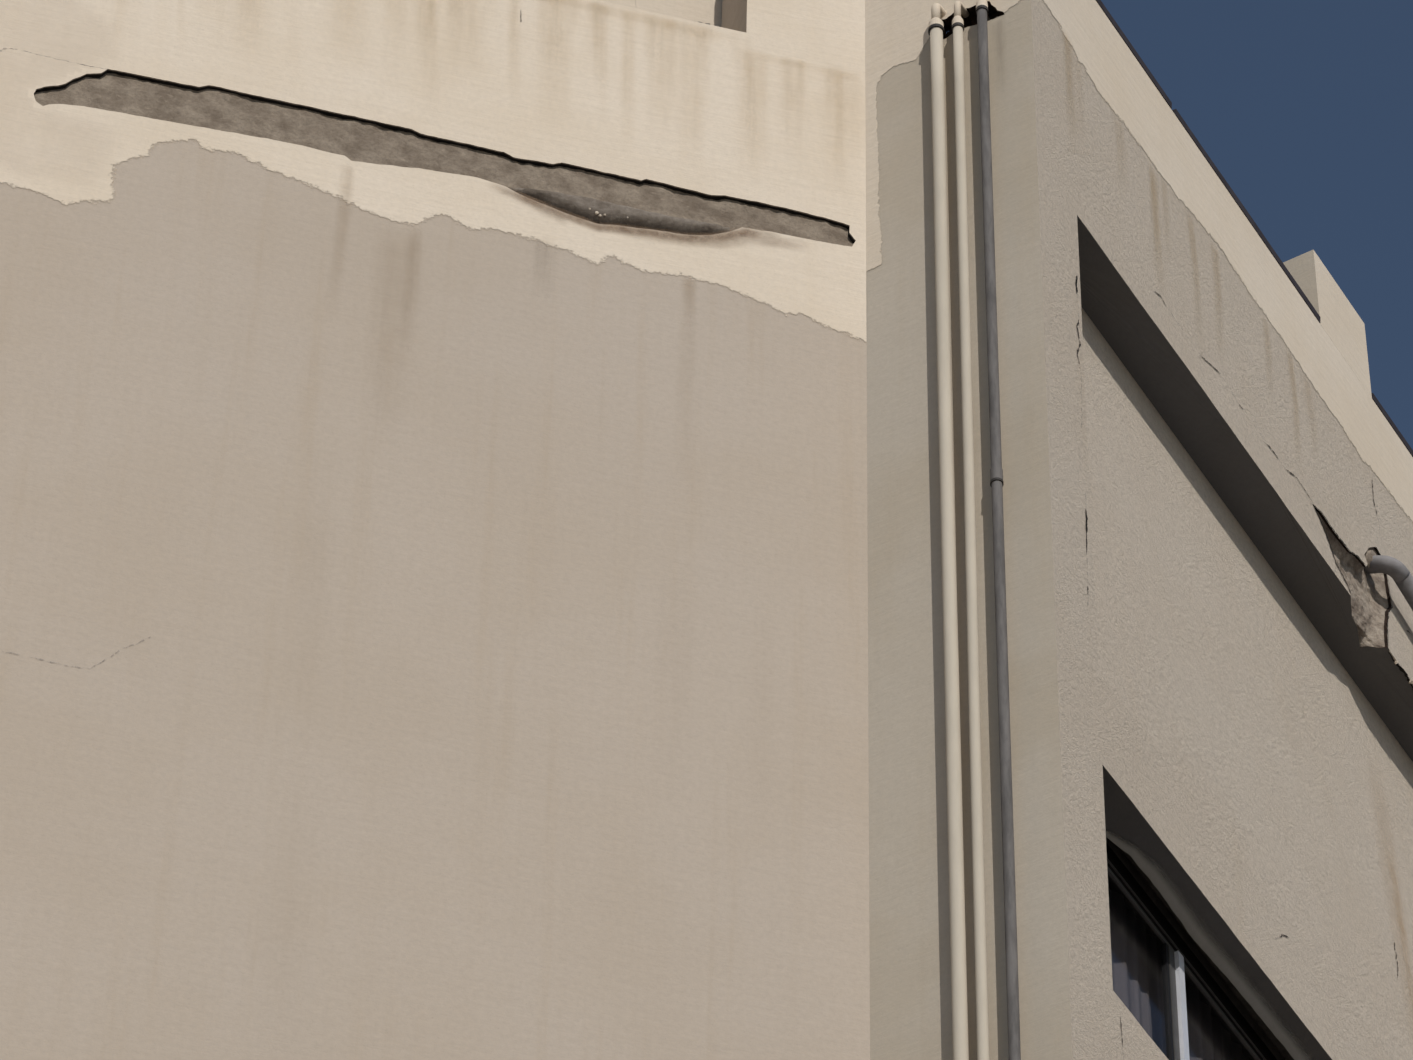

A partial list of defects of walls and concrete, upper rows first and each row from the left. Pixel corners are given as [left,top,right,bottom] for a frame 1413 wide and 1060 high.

spalling [34,69,856,247]
crack [1075,276,1083,386]
crack [1083,496,1091,590]
spalling [1313,504,1413,688]